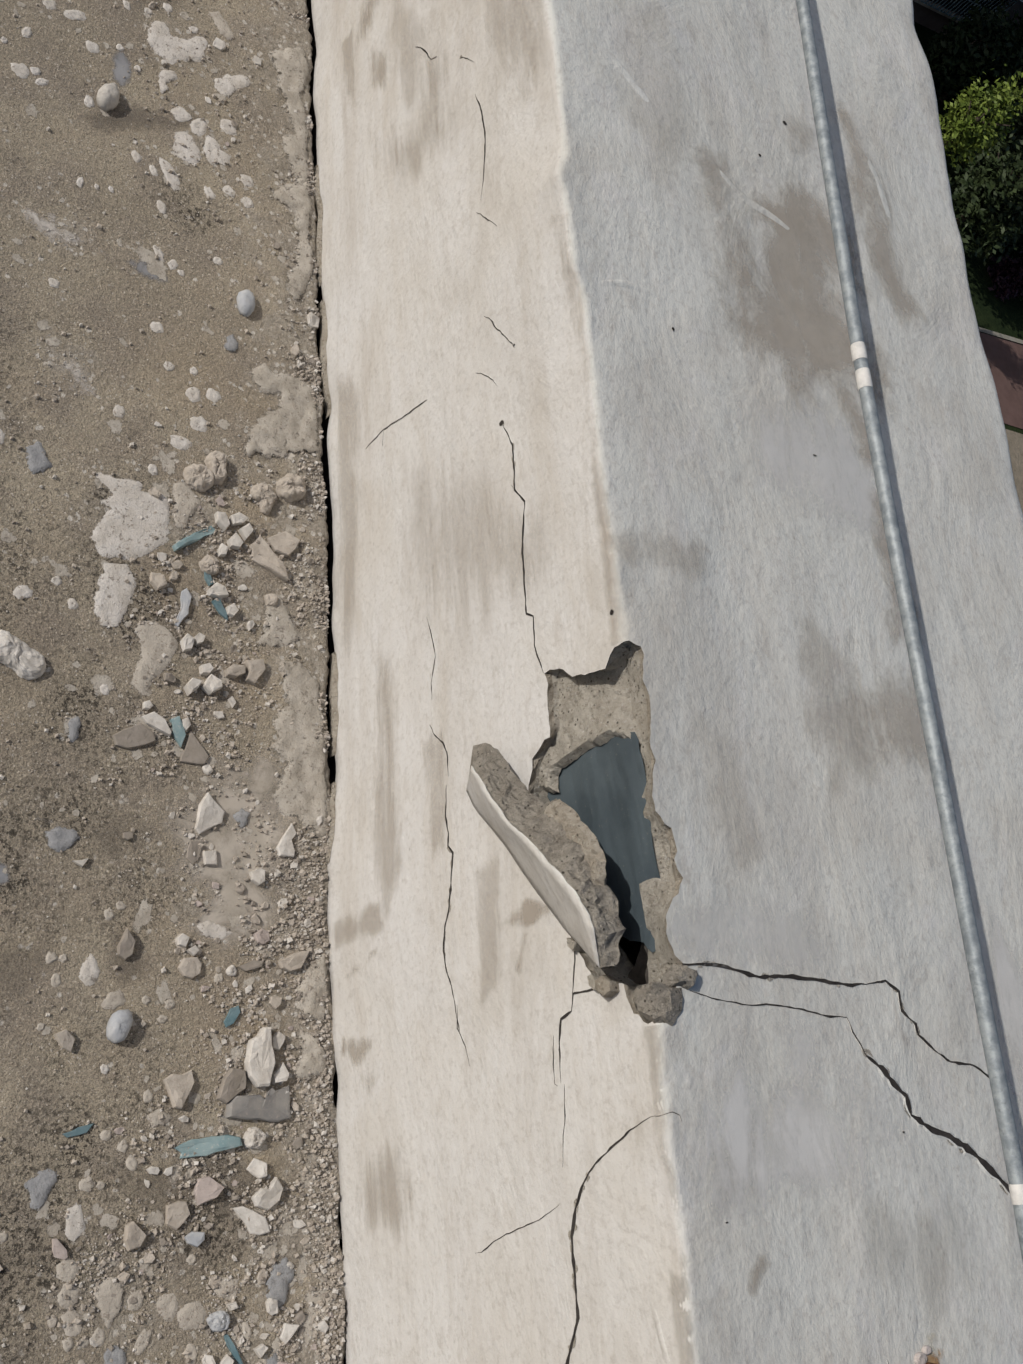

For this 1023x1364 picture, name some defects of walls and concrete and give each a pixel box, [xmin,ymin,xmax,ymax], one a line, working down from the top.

crack [475,94,497,226]
crack [367,400,427,447]
crack [485,316,514,347]
crack [427,617,436,693]
crack [502,423,544,673]
crack [430,725,470,1066]
spalling [528,641,683,1024]
crack [475,951,682,1364]
crack [681,961,1010,1197]